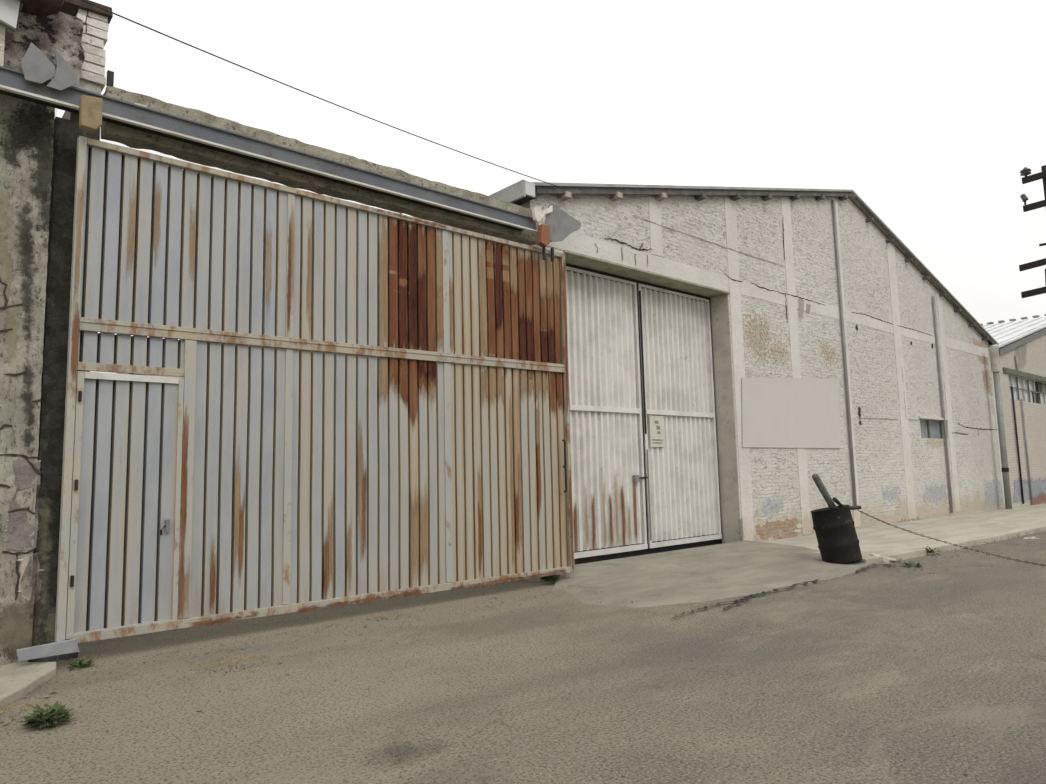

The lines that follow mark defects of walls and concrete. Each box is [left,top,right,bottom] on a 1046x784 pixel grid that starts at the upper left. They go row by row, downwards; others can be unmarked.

spalling [3,11,85,88]
crack [0,278,25,332]
rust [377,209,453,426]
crack [0,484,35,514]
crack [2,550,33,600]
crack [0,424,42,479]
spalling [4,459,45,602]
leakage [0,103,80,654]
rust [178,418,190,617]
rust [192,543,258,627]
rust [478,241,570,561]
rust [452,475,637,590]